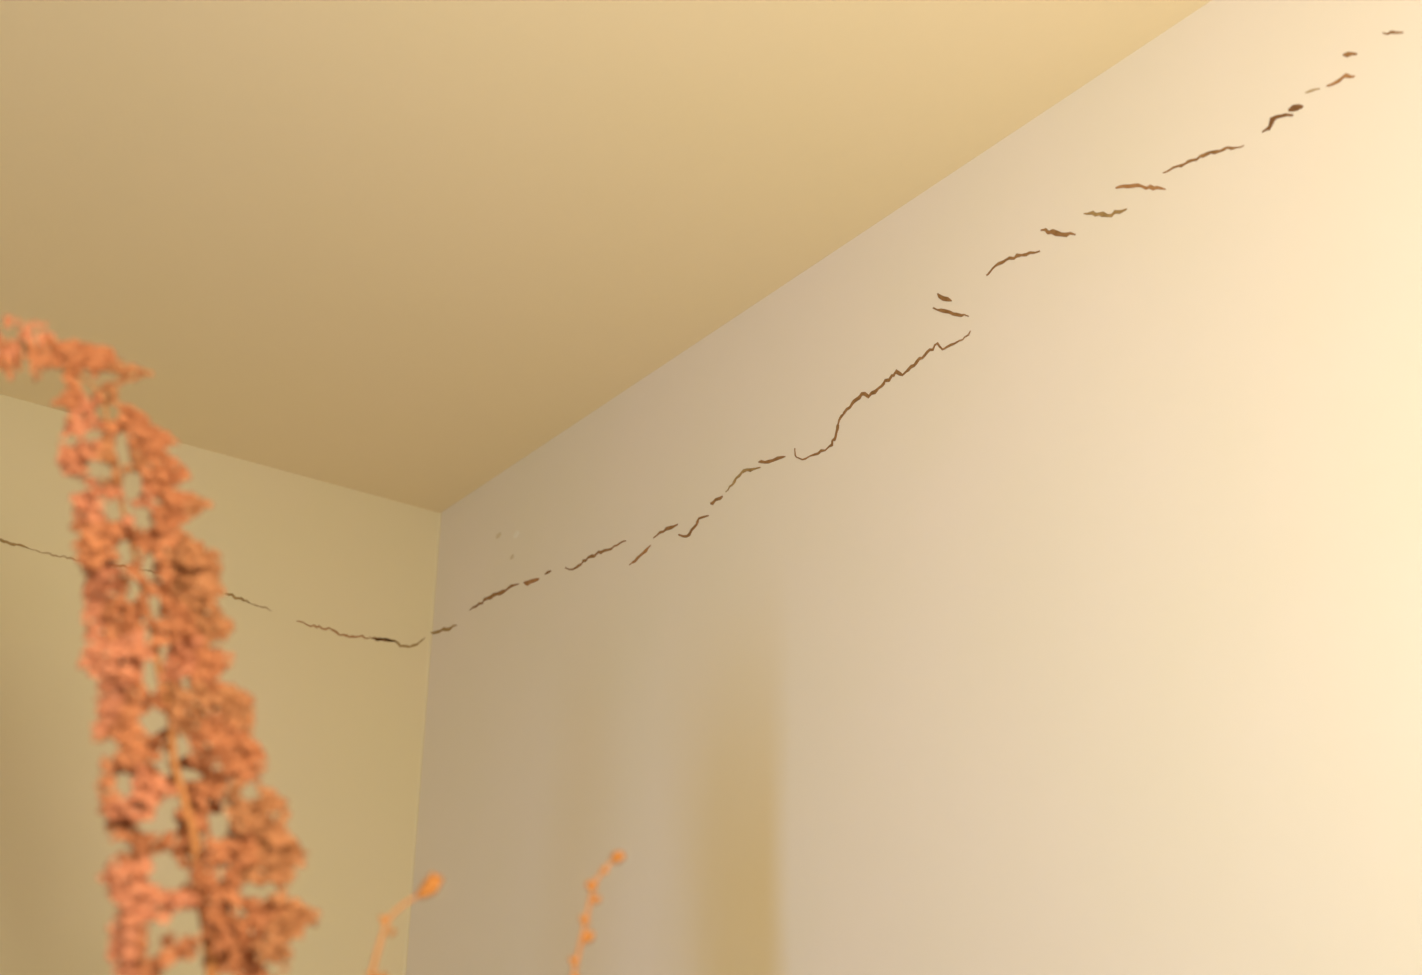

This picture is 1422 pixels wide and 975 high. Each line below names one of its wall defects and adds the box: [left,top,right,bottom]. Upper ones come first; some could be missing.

crack [986,30,1403,276]
crack [0,538,78,561]
crack [197,293,971,648]